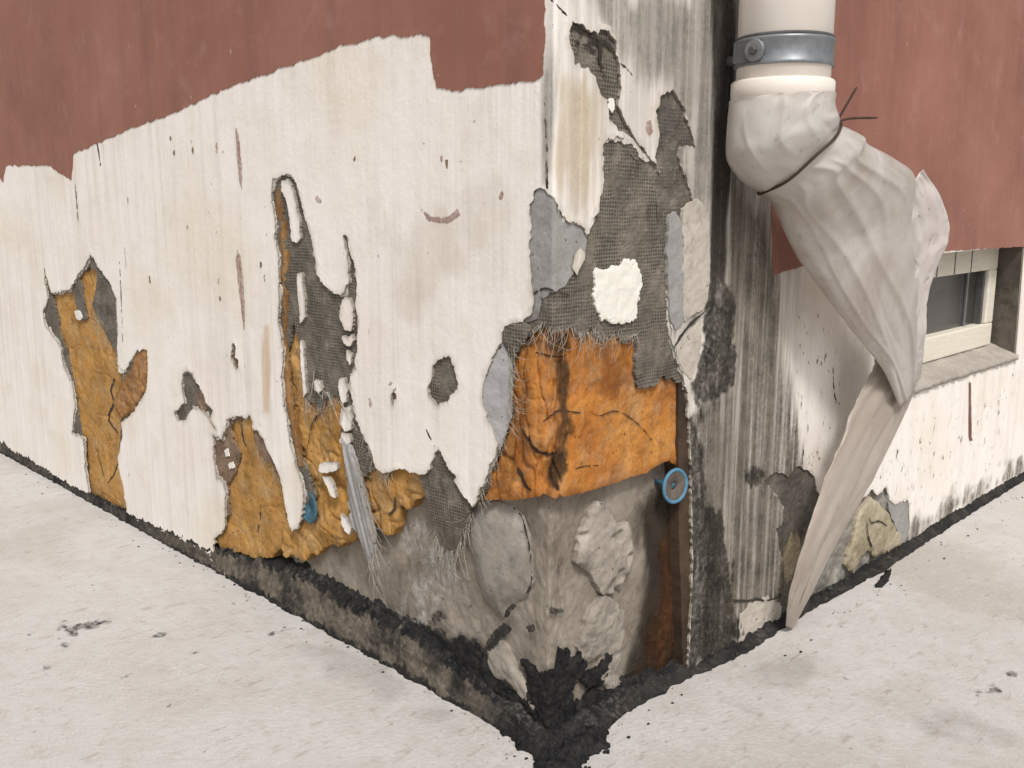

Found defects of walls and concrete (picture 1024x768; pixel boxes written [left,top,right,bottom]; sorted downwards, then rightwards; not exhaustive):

peeling [44,256,148,508]
spalling [176,0,694,710]
damp [601,0,820,679]
damp [382,579,518,695]
peeling [765,466,818,613]
spalling [811,490,909,595]